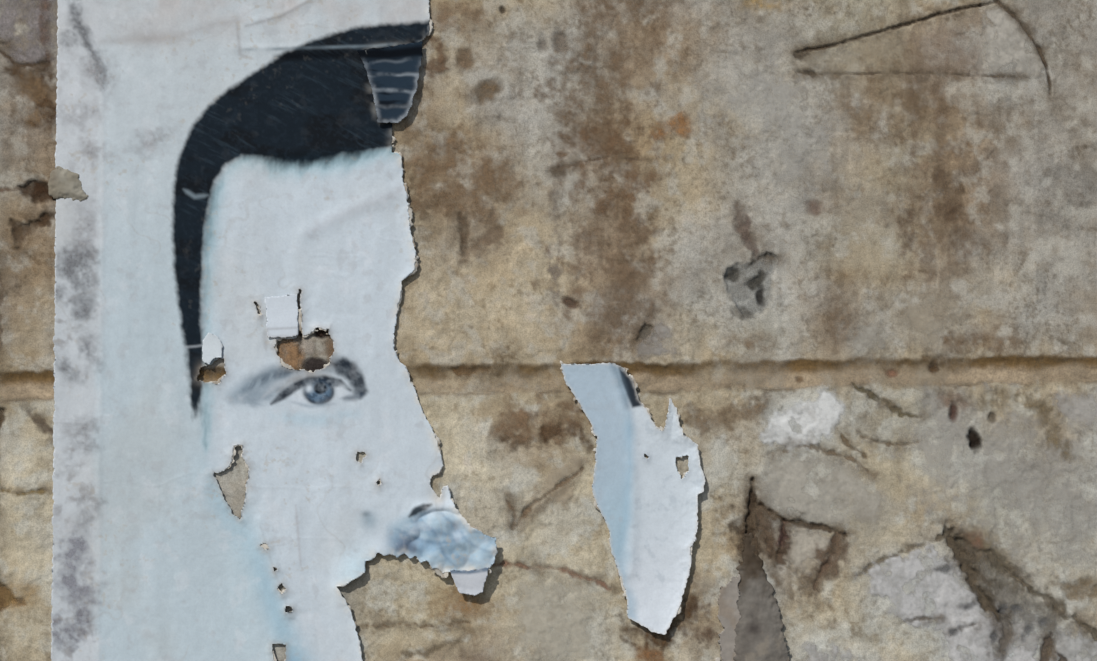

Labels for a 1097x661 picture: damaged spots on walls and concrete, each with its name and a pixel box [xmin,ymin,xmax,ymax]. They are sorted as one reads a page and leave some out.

crack [795,0,1051,95]
damp [566,45,655,239]
spalling [458,213,503,255]
spalling [724,210,778,318]
spalling [277,328,334,372]
spalling [453,365,488,376]
crack [782,383,918,475]
crack [745,477,847,590]
flaking render [715,533,790,661]
crack [864,526,1097,661]
flaking render [868,545,1097,661]